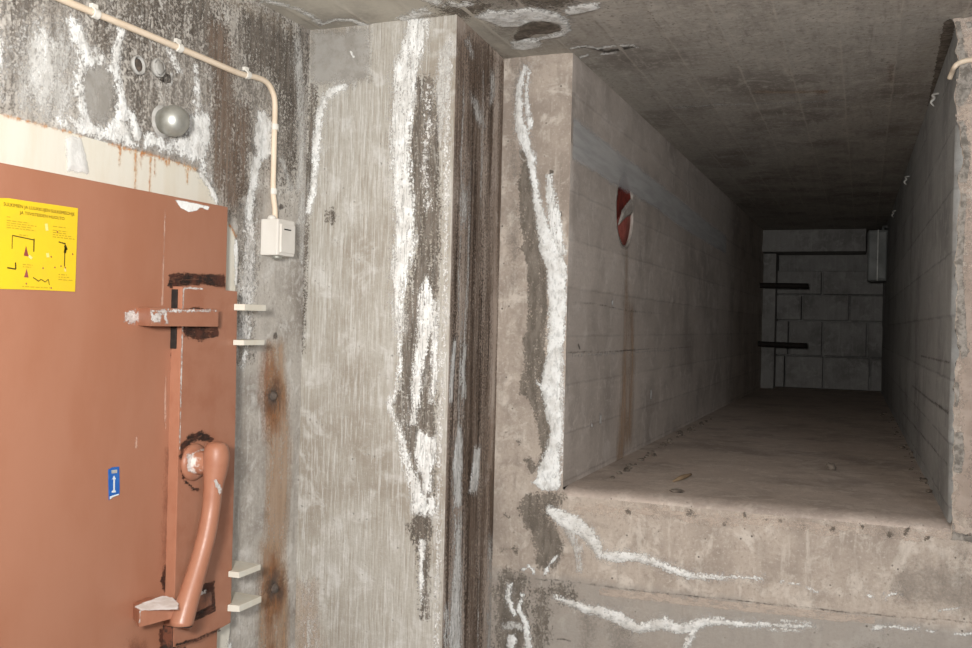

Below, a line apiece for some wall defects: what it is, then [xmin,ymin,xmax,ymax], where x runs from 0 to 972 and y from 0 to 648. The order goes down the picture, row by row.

damp [0,0,370,369]
corrosion [260,344,318,648]
spalling [514,22,562,41]
damp [386,0,812,648]